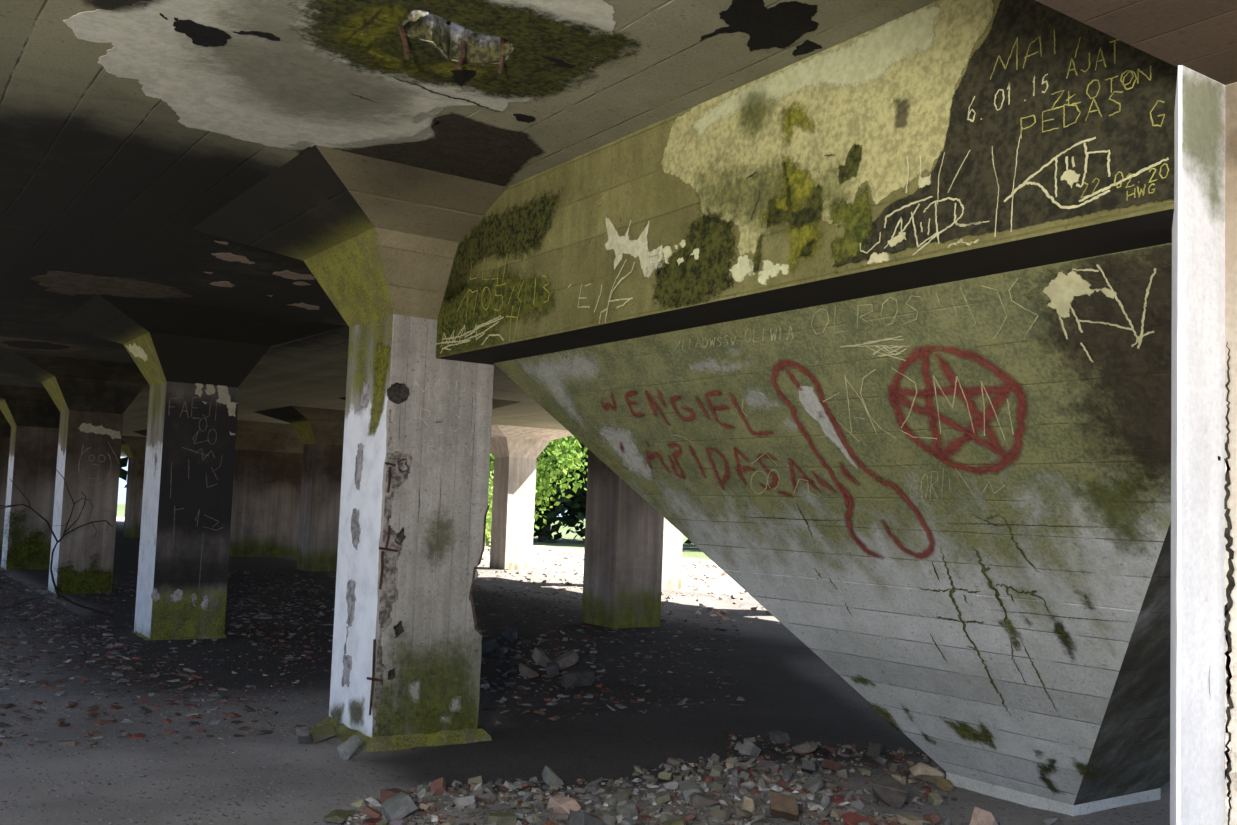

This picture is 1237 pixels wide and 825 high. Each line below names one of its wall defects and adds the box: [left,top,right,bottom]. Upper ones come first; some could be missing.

peeling [63,0,541,150]
peeling [489,0,616,35]
damp [743,96,764,128]
damp [753,158,822,273]
damp [780,103,814,142]
peeling [661,0,994,285]
spalling [296,382,413,760]
crack [740,504,845,538]
crack [919,513,1124,715]
crack [1209,342,1235,825]